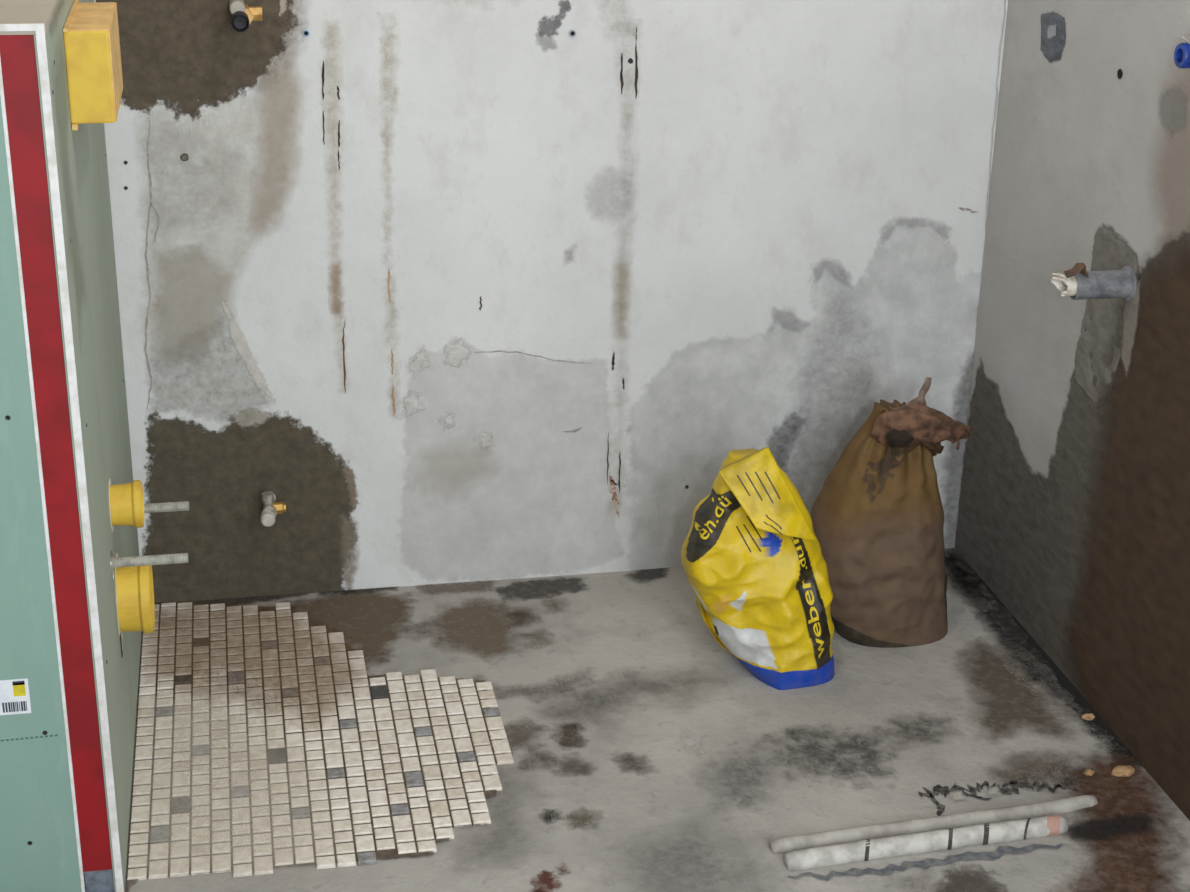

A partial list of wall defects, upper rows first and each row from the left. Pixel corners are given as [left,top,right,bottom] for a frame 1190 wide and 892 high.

peeling [235,408,271,427]
peeling [340,457,358,513]